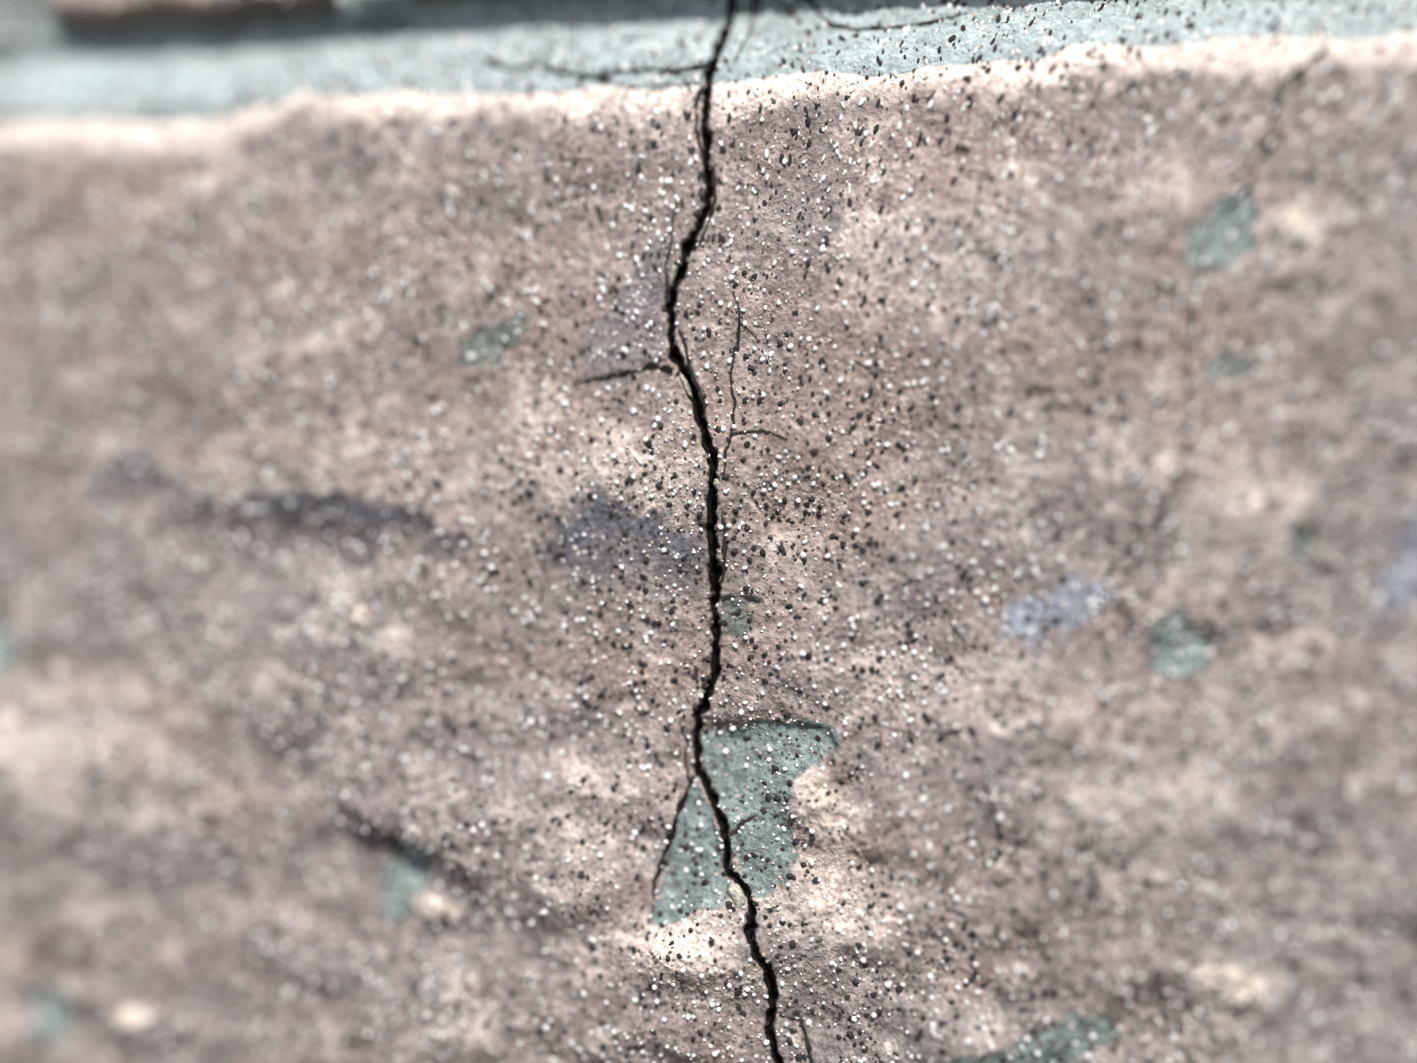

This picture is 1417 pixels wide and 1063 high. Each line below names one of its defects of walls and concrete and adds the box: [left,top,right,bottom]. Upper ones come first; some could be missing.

crack [805,0,968,31]
peeling [1184,194,1260,265]
crack [477,0,814,1063]
peeling [1148,608,1209,678]
spalling [651,718,837,925]
peeling [951,1013,1119,1063]